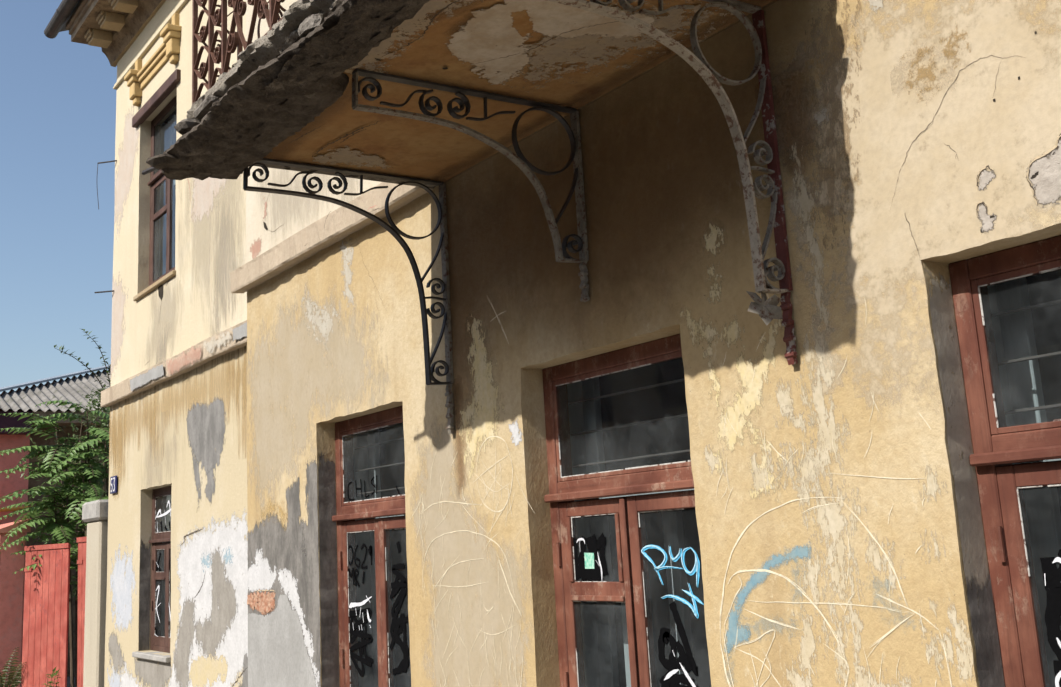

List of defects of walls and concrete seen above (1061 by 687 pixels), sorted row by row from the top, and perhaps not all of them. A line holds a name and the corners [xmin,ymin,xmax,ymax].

peeling [345,0,734,92]
crack [890,55,1025,256]
flaking render [976,165,997,233]
flaking render [1026,133,1061,210]
peeling [459,314,522,479]
peeling [680,143,921,687]
peeling [107,509,320,687]
peeling [920,597,975,686]